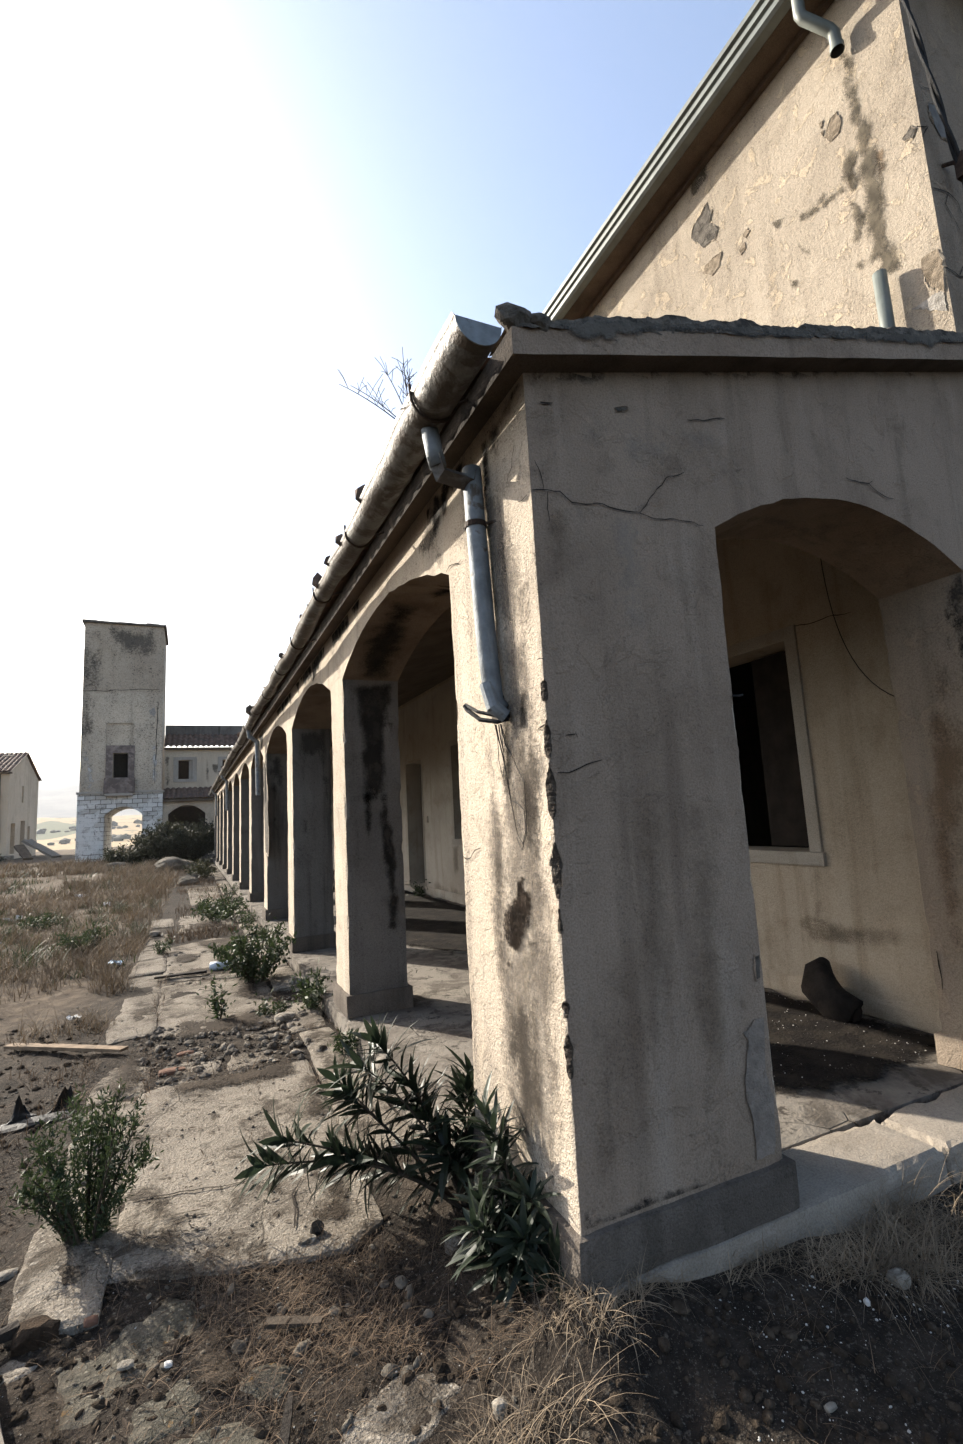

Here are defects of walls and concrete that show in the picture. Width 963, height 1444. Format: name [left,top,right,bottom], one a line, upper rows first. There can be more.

spalling [819,111,842,143]
leakage [800,54,900,273]
spalling [690,202,722,276]
crack [506,449,704,526]
spalling [540,680,548,702]
leakage [356,684,399,929]
leakage [482,427,561,1169]
spalling [543,720,556,819]
spalling [550,843,563,934]